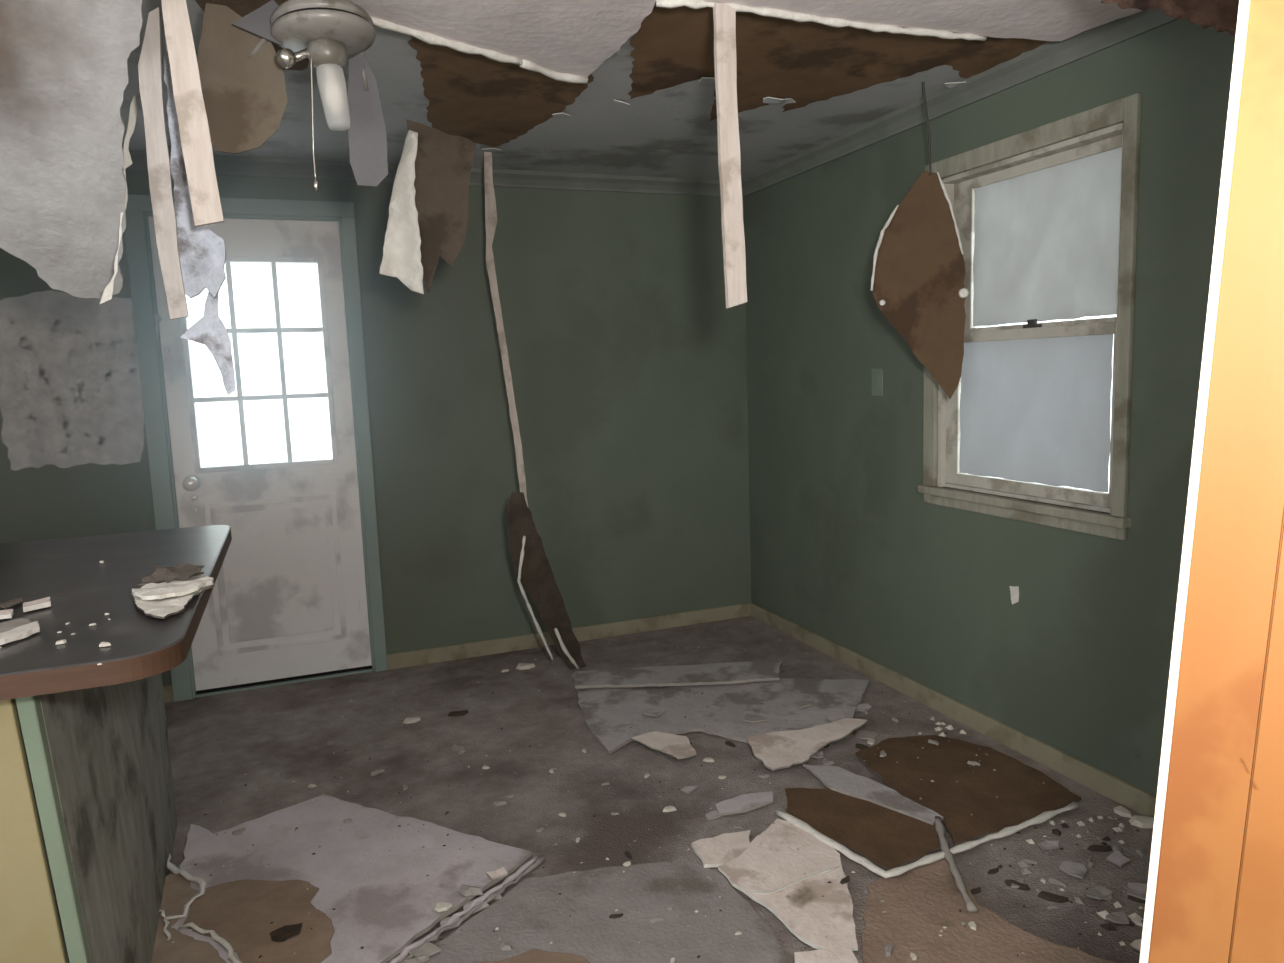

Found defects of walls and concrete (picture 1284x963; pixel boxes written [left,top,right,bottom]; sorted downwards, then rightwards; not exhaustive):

spalling [195,0,288,17]
spalling [283,58,310,71]
spalling [370,16,594,152]
spalling [614,0,1047,121]
spalling [870,205,899,291]
spalling [937,172,963,254]